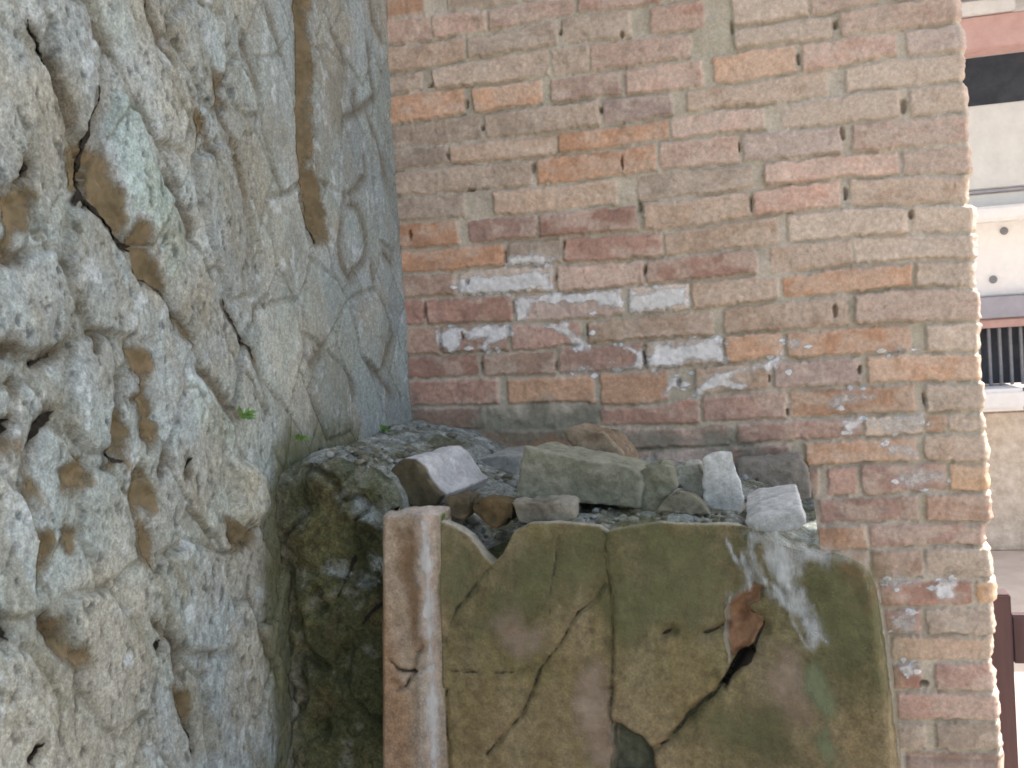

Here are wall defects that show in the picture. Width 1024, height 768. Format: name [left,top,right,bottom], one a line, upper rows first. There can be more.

crack [72,85,161,295]
damp [435,253,690,354]
damp [609,335,813,398]
crack [446,571,614,739]
crack [661,610,765,744]
spalling [726,583,764,655]
damp [728,534,827,646]